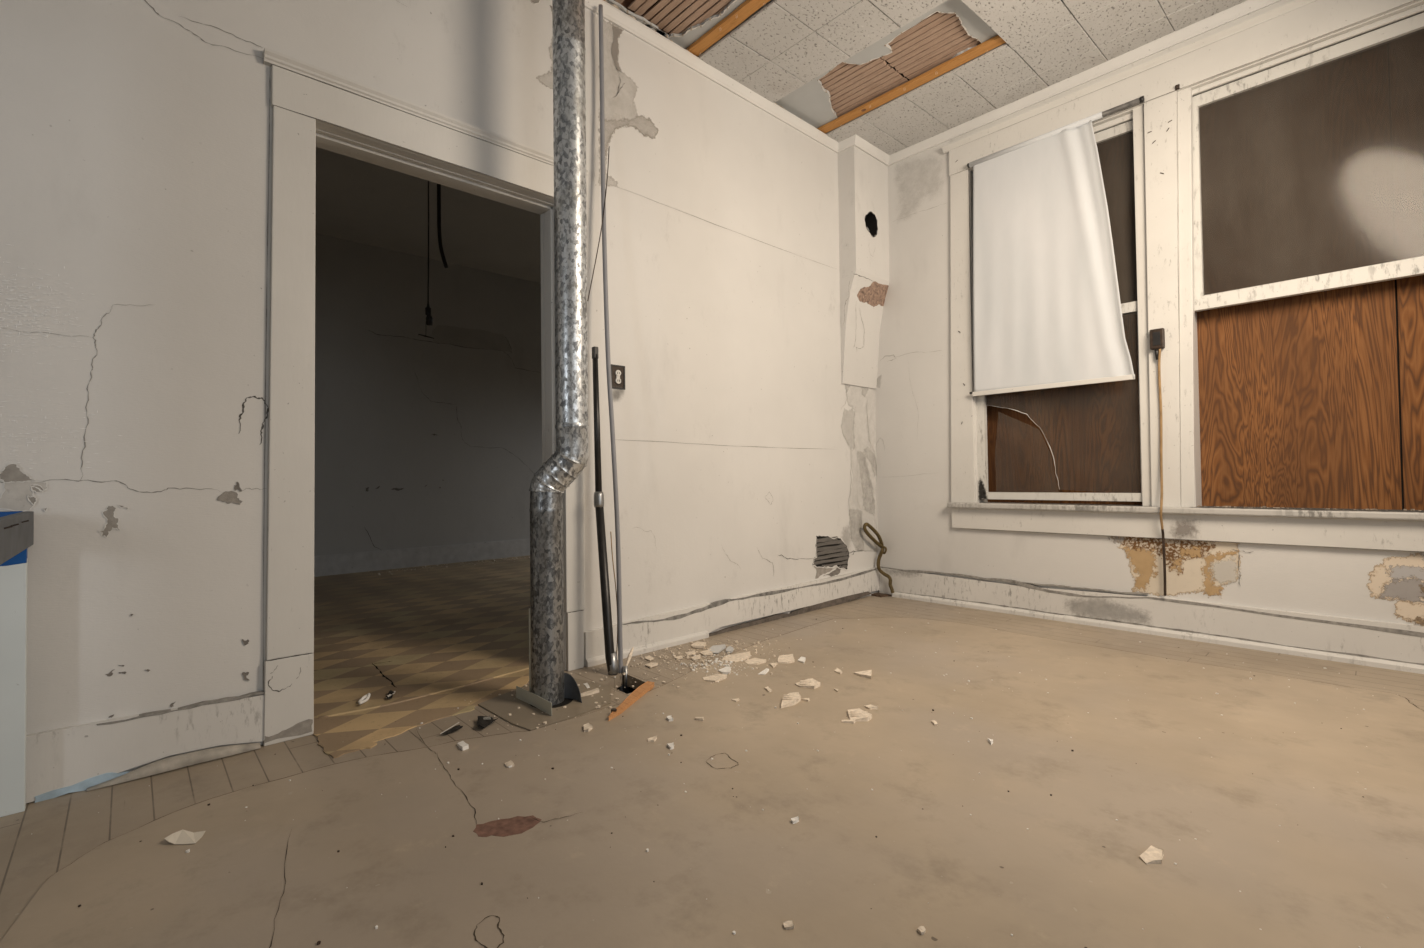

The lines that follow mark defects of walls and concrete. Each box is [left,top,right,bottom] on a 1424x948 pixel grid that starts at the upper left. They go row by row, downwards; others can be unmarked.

crack [145,0,263,59]
flaking render [605,0,737,53]
flaking render [817,11,982,118]
flaking render [857,281,889,307]
crack [4,304,269,493]
peeling [0,463,48,512]
peeling [217,482,242,505]
flaking render [779,535,862,579]